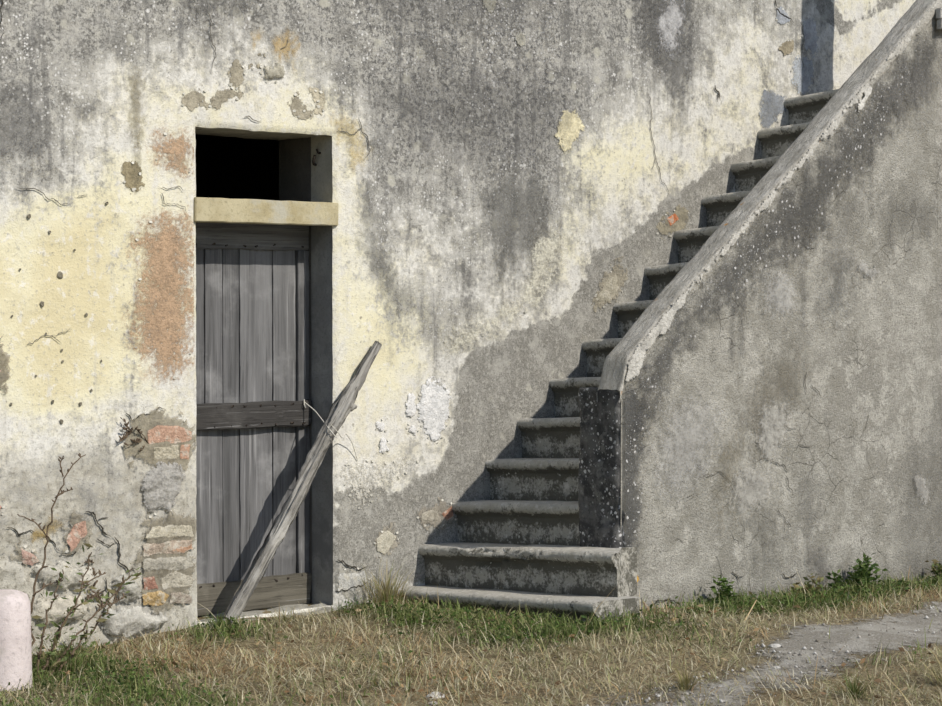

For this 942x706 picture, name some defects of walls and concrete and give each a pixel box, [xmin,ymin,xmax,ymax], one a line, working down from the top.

leakage [658,0,685,49]
flaking render [181,53,266,111]
flaking render [121,161,145,194]
crack [648,94,669,192]
flaking render [626,0,941,382]
flaking render [130,211,194,382]
flaking render [0,337,12,406]
flaking render [120,407,196,471]
crack [756,439,793,530]
crack [7,527,76,565]
crack [86,511,138,636]
flaking render [135,509,197,616]